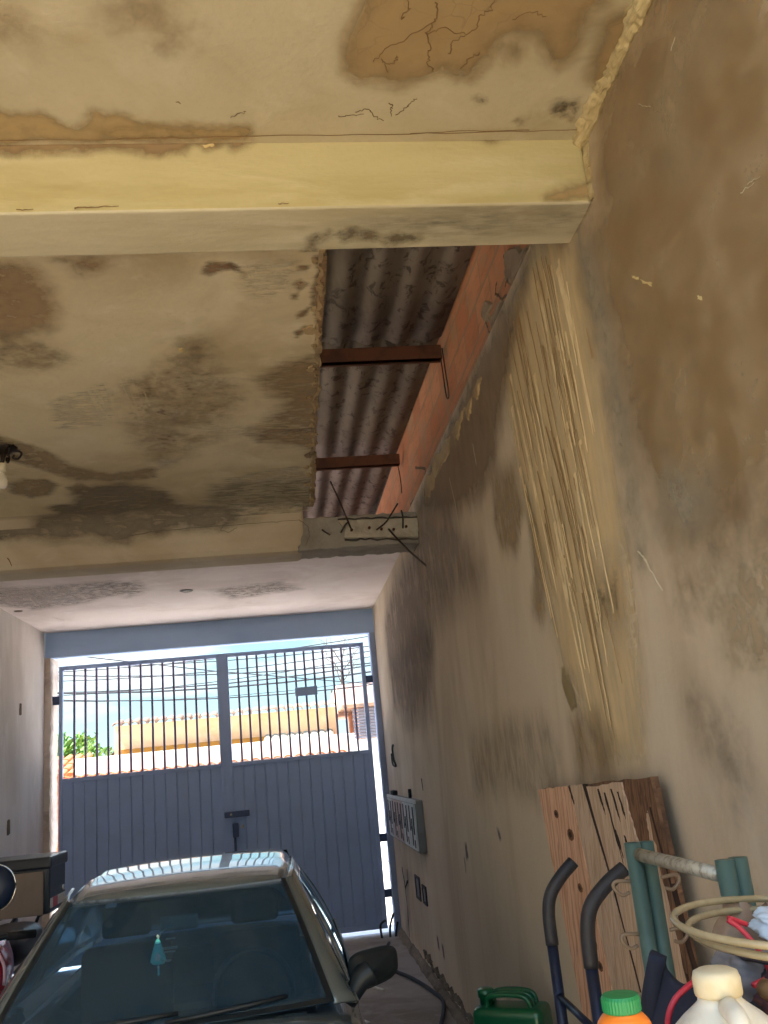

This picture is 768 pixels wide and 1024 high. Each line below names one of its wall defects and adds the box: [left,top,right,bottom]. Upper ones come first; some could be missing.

crack [373,0,546,73]
damp [344,0,600,83]
damp [0,266,56,364]
damp [134,355,319,453]
spalling [293,249,327,507]
damp [386,0,768,770]
damp [0,437,240,541]
spalling [338,516,419,541]